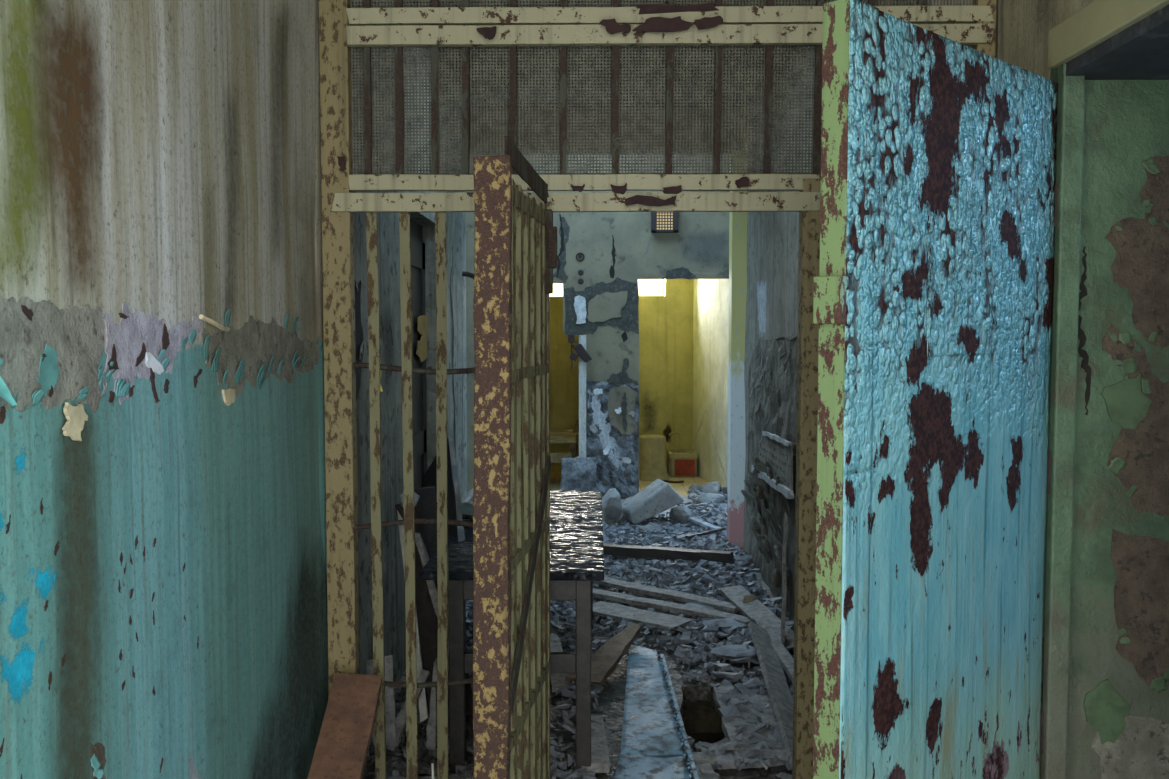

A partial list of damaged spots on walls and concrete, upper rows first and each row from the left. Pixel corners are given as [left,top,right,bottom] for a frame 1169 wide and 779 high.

peeling [0,294,324,441]